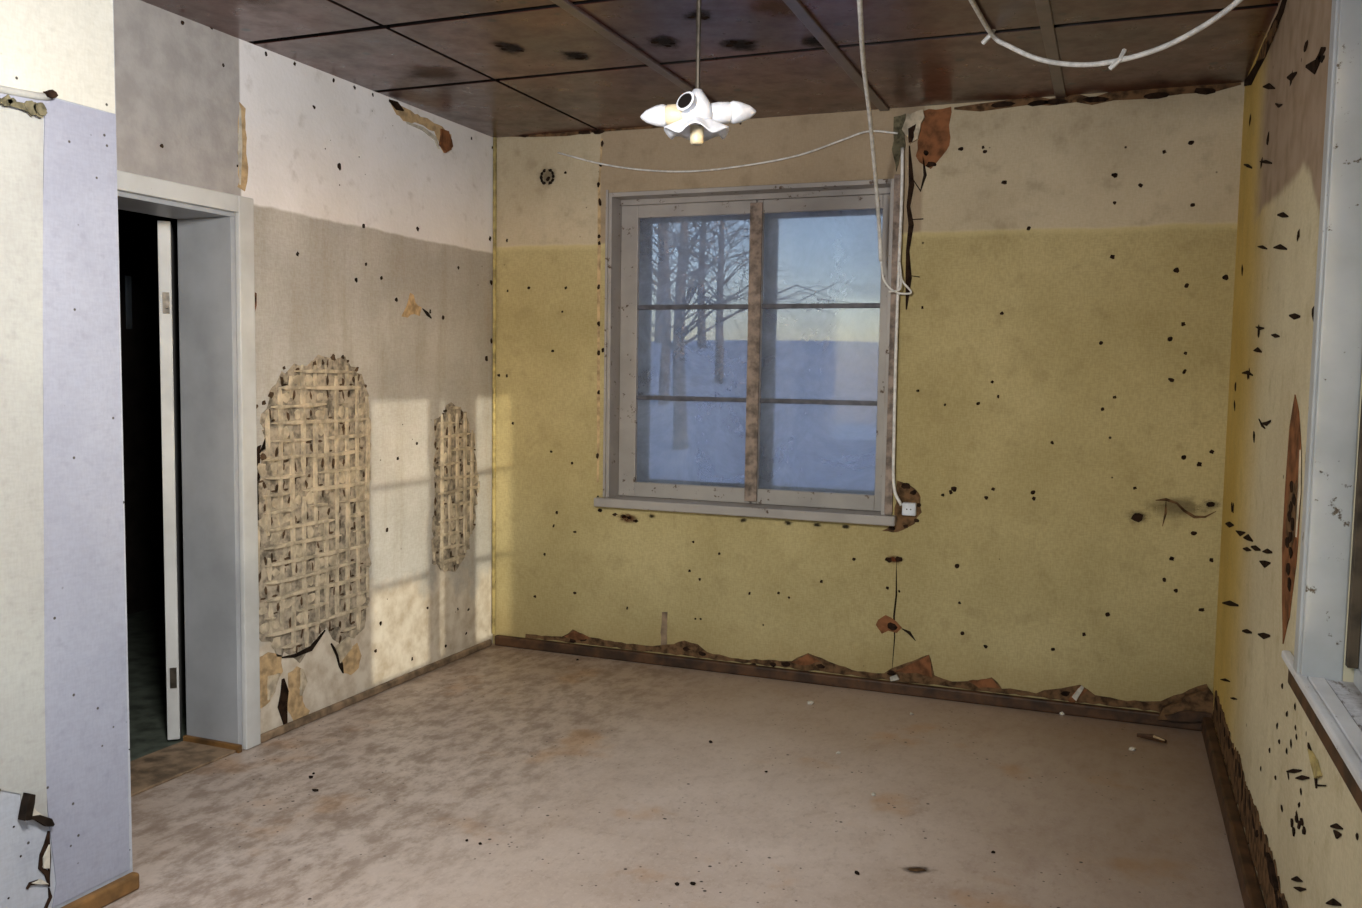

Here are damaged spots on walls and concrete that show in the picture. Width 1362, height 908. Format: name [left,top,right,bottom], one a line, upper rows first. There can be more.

peeling [389,99,453,153]
flaking render [892,107,952,172]
flaking render [256,354,372,725]
flaking render [431,402,480,572]
flaking render [883,481,922,532]
flaking render [1225,395,1306,644]
flaking render [876,561,916,667]